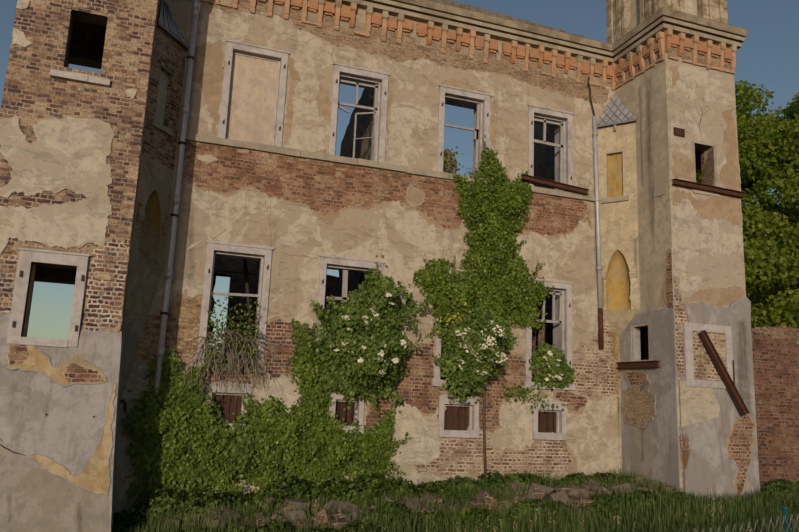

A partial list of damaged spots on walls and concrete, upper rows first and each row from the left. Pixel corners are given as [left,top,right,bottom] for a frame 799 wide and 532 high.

flaking render [191,39,225,134]
flaking render [182,55,463,233]
flaking render [0,114,130,332]
flaking render [133,198,145,233]
flaking render [513,193,593,240]
spalling [5,343,117,496]
flaking render [364,337,578,479]
flaking render [552,317,657,428]
flaking render [661,248,746,427]